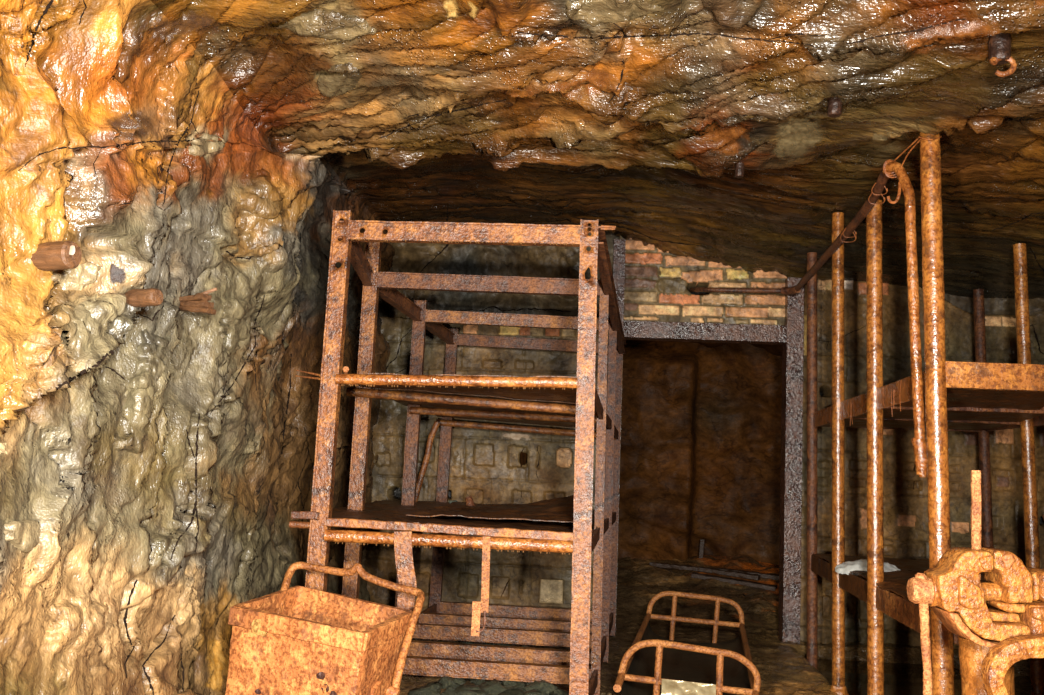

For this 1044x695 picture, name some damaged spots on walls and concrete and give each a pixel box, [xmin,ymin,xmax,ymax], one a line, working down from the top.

crack [55,350,125,390]
crack [170,295,265,560]
crack [123,580,184,695]